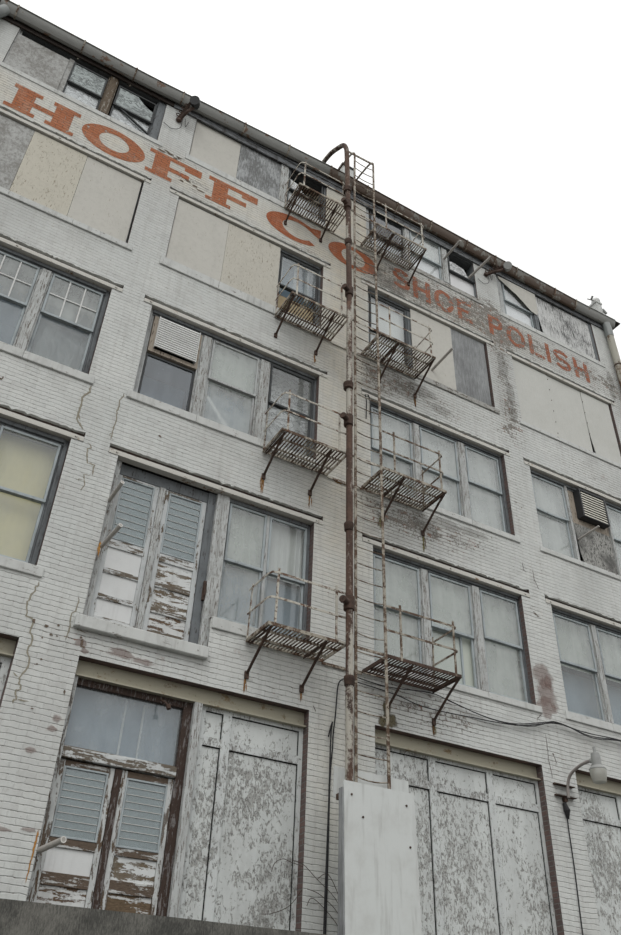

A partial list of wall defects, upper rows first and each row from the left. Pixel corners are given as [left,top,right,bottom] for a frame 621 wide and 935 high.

crack [76,386,124,490]
crack [12,583,39,702]